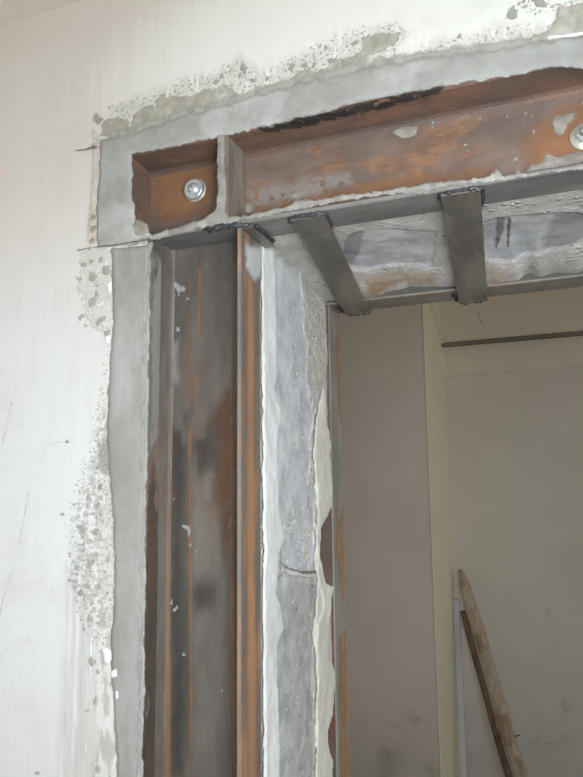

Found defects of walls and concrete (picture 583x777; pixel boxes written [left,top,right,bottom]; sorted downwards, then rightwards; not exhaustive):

peeling [77,0,583,352]
corrosion [534,113,583,165]
spalling [60,390,117,678]
corrosion [218,398,236,777]
corrosion [247,277,256,777]
spalling [274,255,327,777]
corrosion [340,631,349,777]